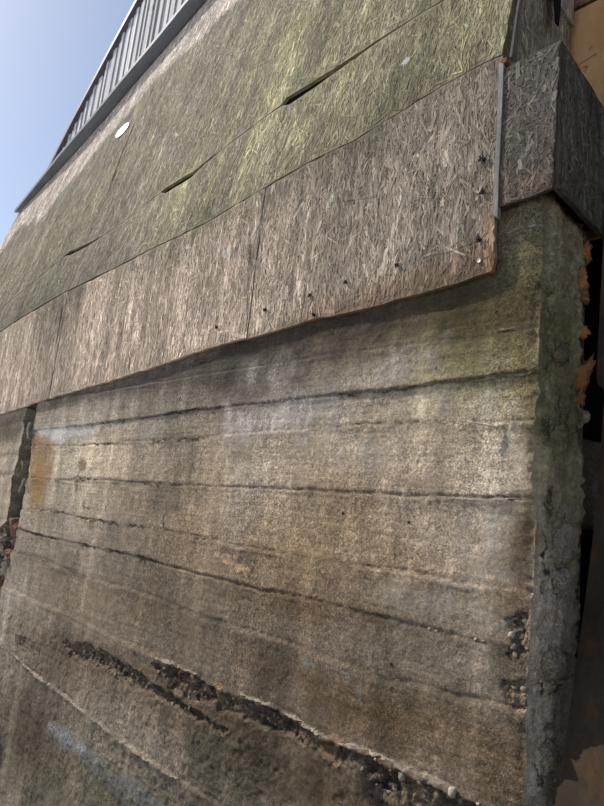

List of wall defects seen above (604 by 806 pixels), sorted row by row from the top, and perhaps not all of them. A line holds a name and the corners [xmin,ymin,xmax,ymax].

corrosion [29,435,53,513]
spalling [15,634,40,654]
spalling [504,614,529,663]
spalling [62,640,324,756]
spalling [504,679,529,715]
spalling [333,746,480,806]